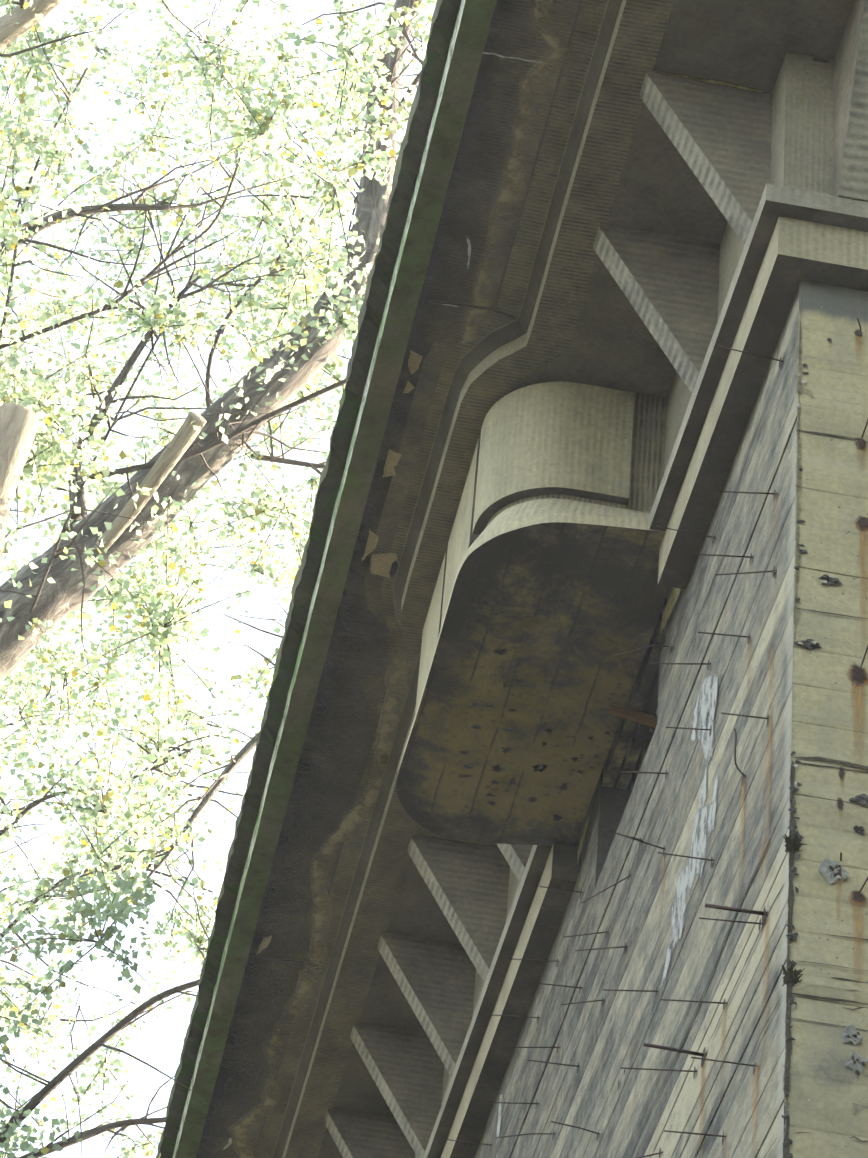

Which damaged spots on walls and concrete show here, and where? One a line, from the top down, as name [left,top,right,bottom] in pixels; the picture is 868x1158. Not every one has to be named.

leakage [459,0,571,344]
corrosion [856,516,868,572]
leakage [196,0,511,1158]
corrosion [849,664,868,728]
spalling [819,859,849,885]
corrosion [850,891,865,944]
spalling [841,1024,868,1073]